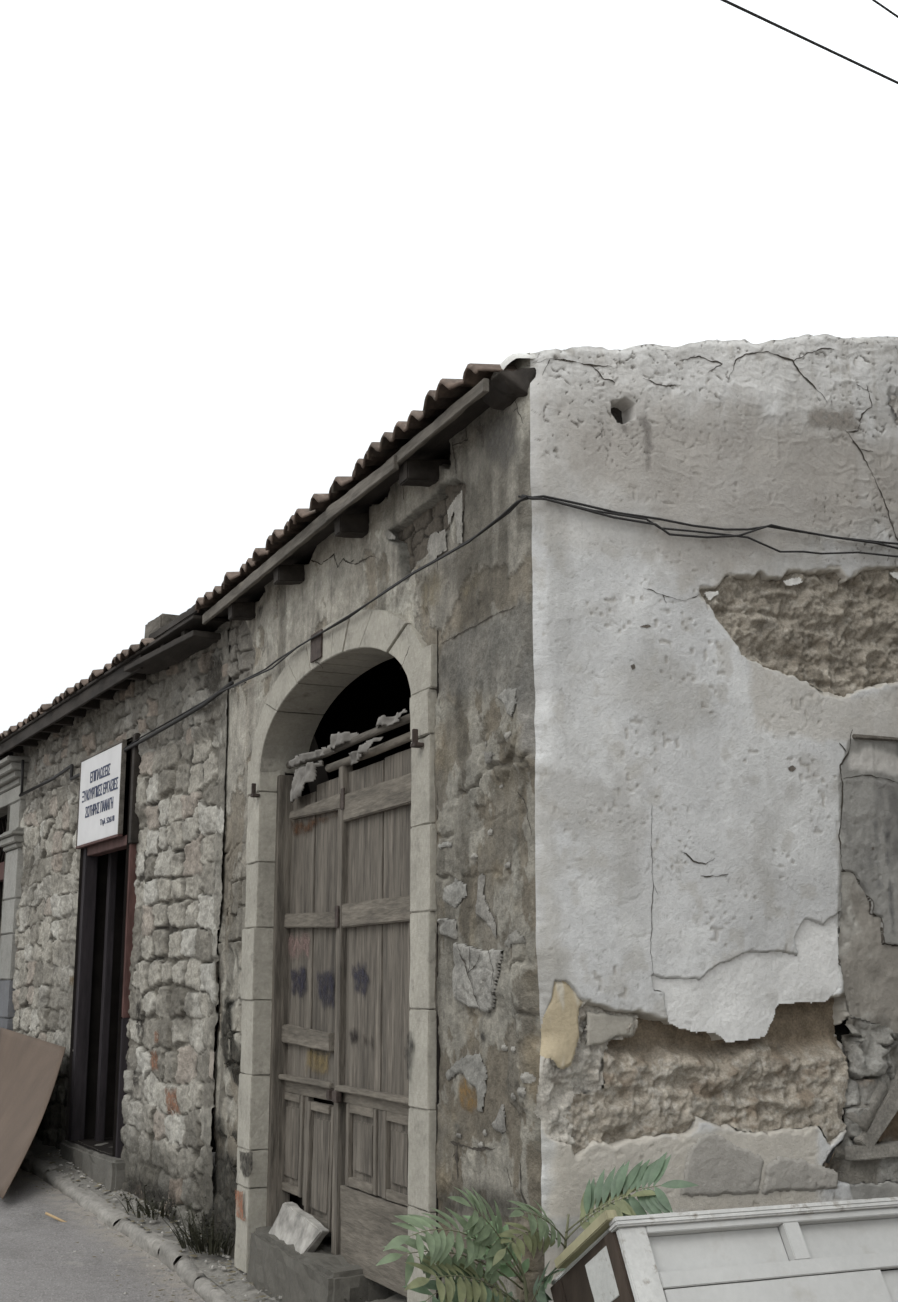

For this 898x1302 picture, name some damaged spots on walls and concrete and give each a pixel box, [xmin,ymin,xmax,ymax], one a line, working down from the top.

crack [526,358,615,383]
crack [646,348,832,402]
crack [845,385,898,540]
spalling [699,568,898,697]
crack [836,729,898,946]
spalling [533,872,898,1185]